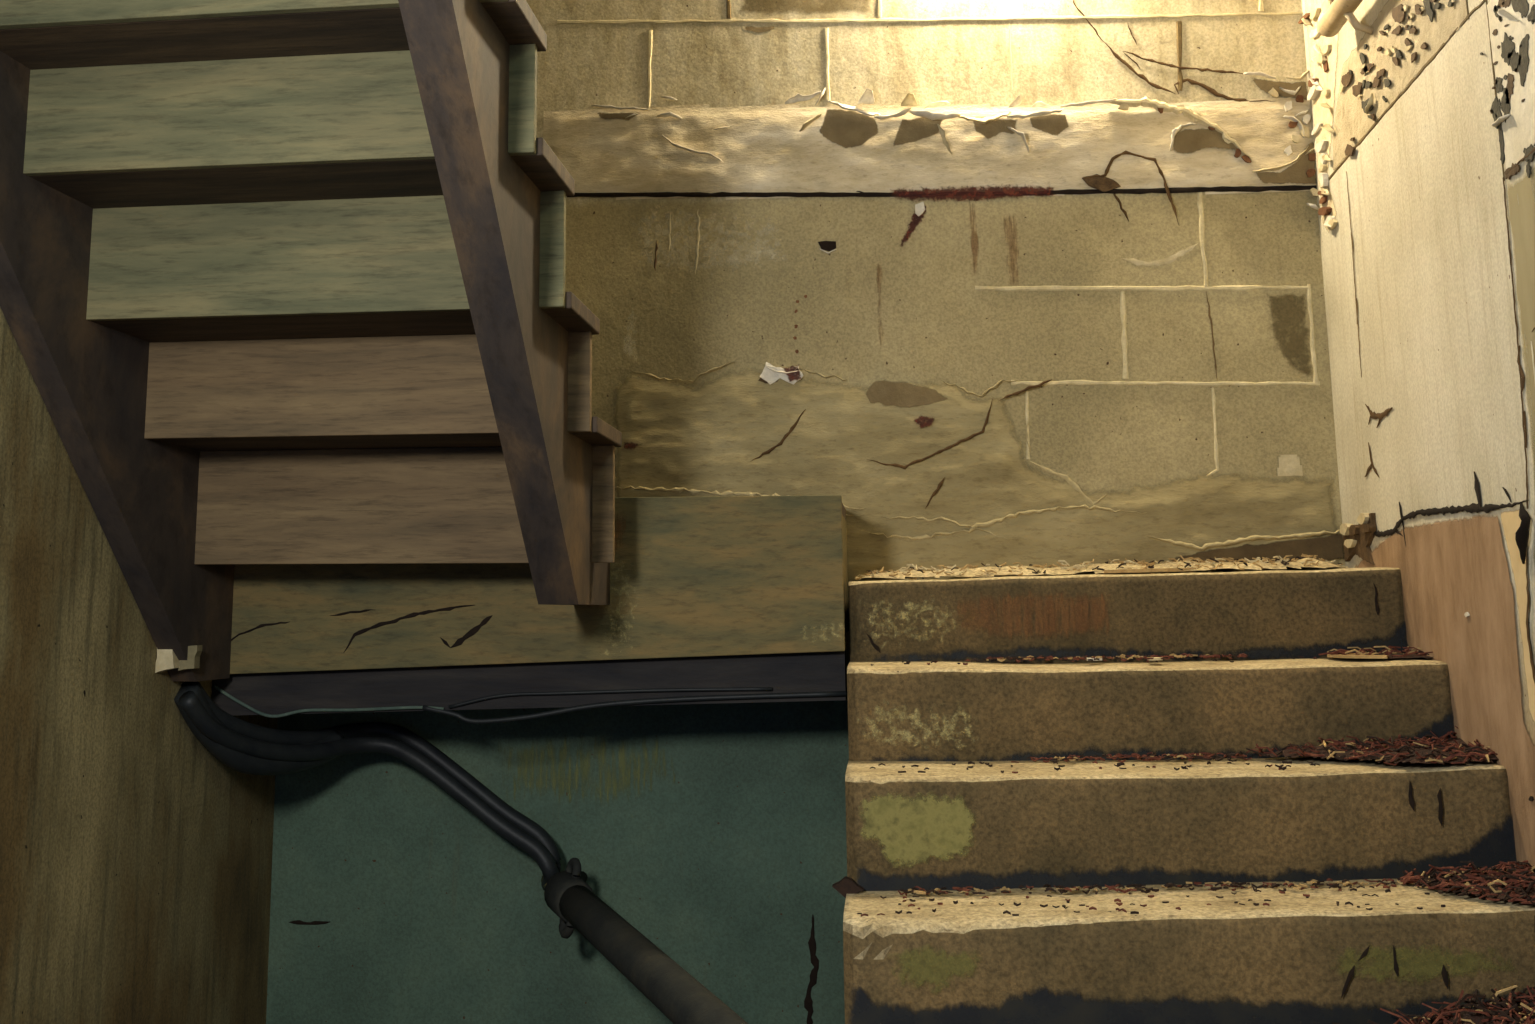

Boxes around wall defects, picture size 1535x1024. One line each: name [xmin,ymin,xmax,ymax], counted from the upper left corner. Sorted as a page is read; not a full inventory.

peeling [591,96,682,120]
spalling [785,0,1467,232]
peeling [1480,0,1535,180]
crack [567,190,899,198]
spalling [818,241,837,253]
leakage [1508,168,1535,479]
crack [1006,150,1535,546]
crack [231,622,288,641]
crack [330,605,492,652]